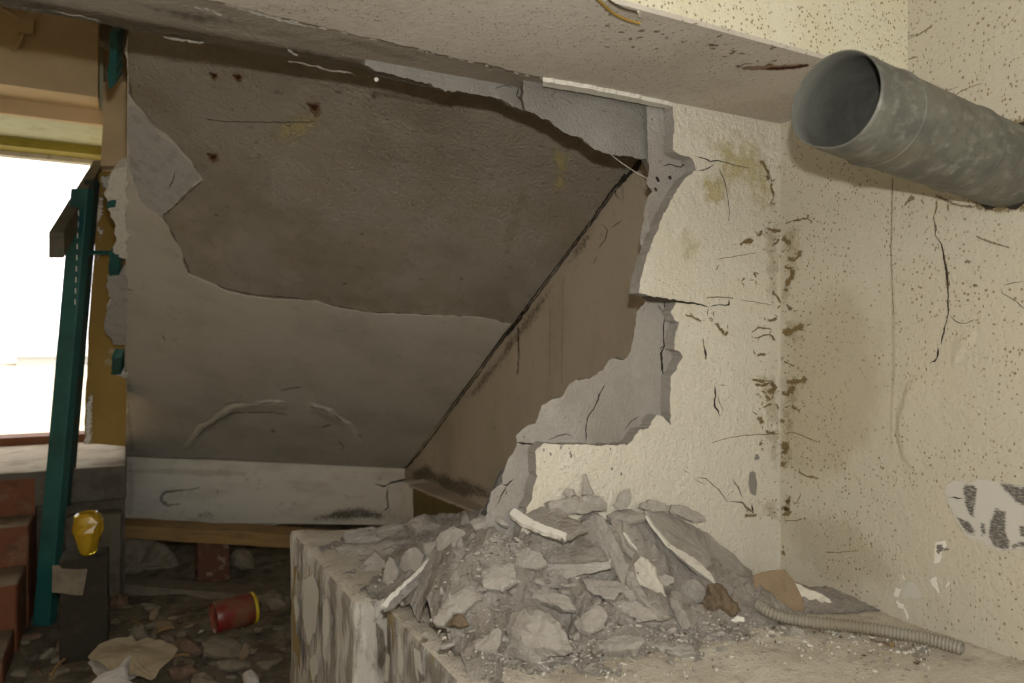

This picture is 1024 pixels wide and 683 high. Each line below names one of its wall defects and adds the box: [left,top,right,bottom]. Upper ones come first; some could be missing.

corrosion [306,103,320,115]
peeling [96,26,200,414]
crack [374,156,748,511]
water stain [706,150,818,479]
crack [932,201,973,362]
peeling [84,391,93,444]
peeling [563,474,595,498]
crack [684,470,757,517]
water stain [760,493,805,534]
peeling [945,479,1024,552]